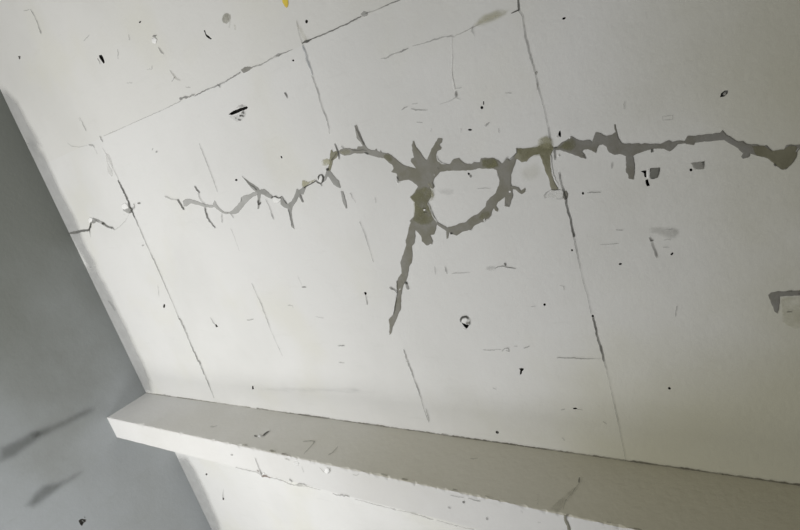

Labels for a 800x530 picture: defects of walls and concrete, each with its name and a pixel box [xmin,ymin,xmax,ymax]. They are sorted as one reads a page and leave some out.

crack [302,0,399,44]
crack [180,67,252,100]
crack [106,154,135,218]
spalling [641,168,660,186]
crack [69,218,114,234]
crack [177,125,800,334]
peeling [768,290,800,313]
crack [592,316,604,361]
crack [451,435,570,453]
crack [628,461,800,486]